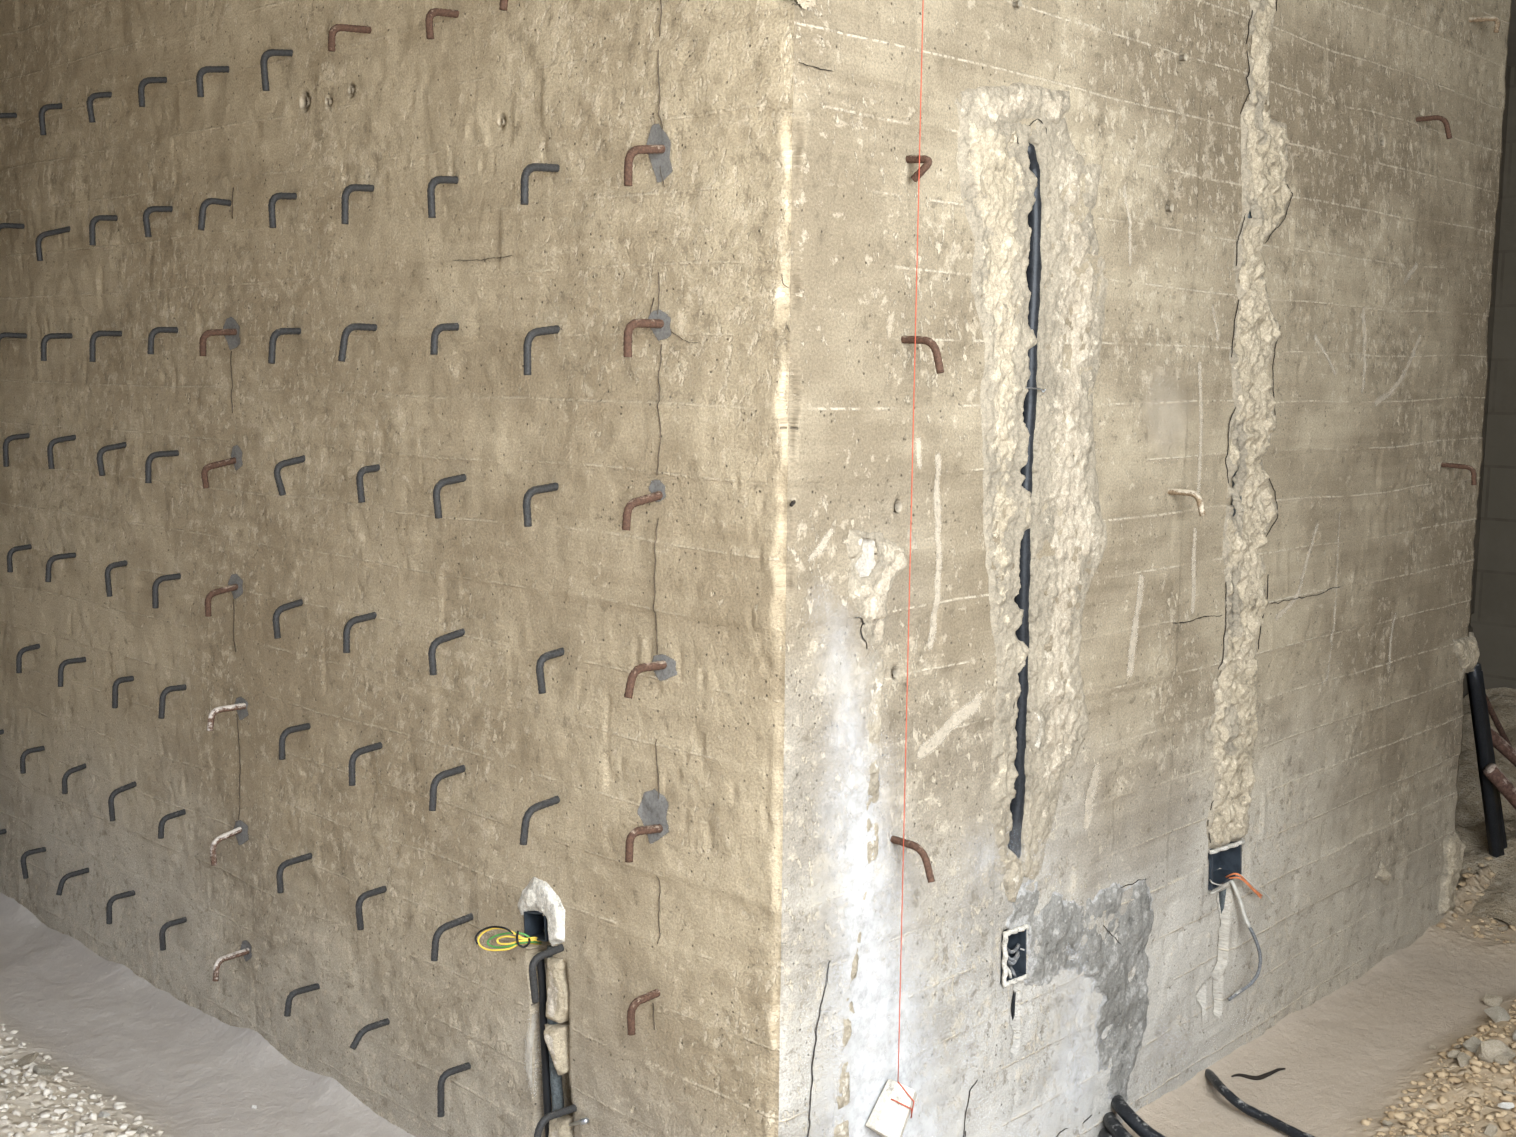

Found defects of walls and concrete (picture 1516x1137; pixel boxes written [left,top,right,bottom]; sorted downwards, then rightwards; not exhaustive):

crack [656,0,664,129]
spalling [797,0,816,9]
crack [650,272,698,476]
spalling [1204,0,1291,849]
spalling [954,82,1108,902]
crack [651,521,659,652]
crack [653,739,661,799]
crack [654,876,662,944]